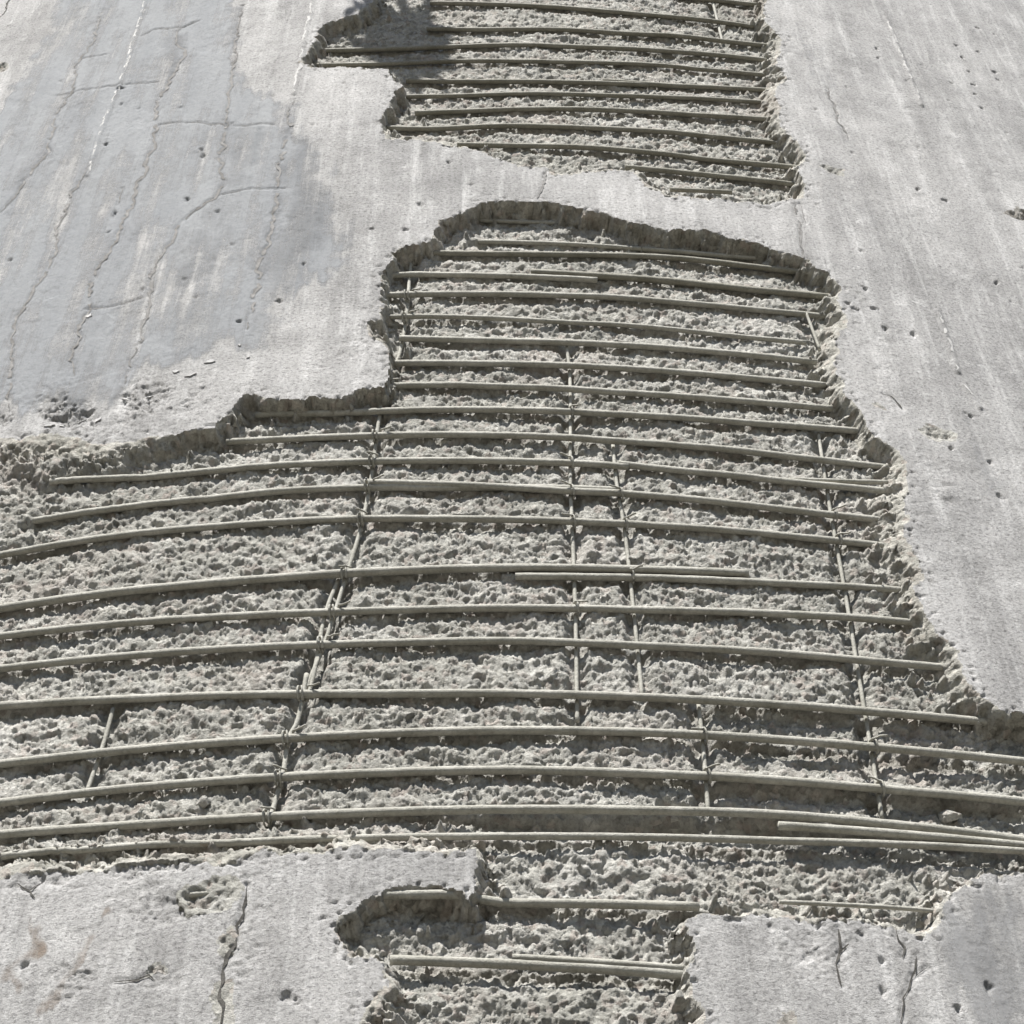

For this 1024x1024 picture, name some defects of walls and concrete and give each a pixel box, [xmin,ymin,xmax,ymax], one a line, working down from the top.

crack [0,9,255,410]
crack [247,101,294,329]
spalling [298,0,806,205]
spalling [0,200,1024,760]
crack [217,887,247,1024]
spalling [0,735,1024,1024]
crack [835,929,849,986]
crack [895,926,926,1023]